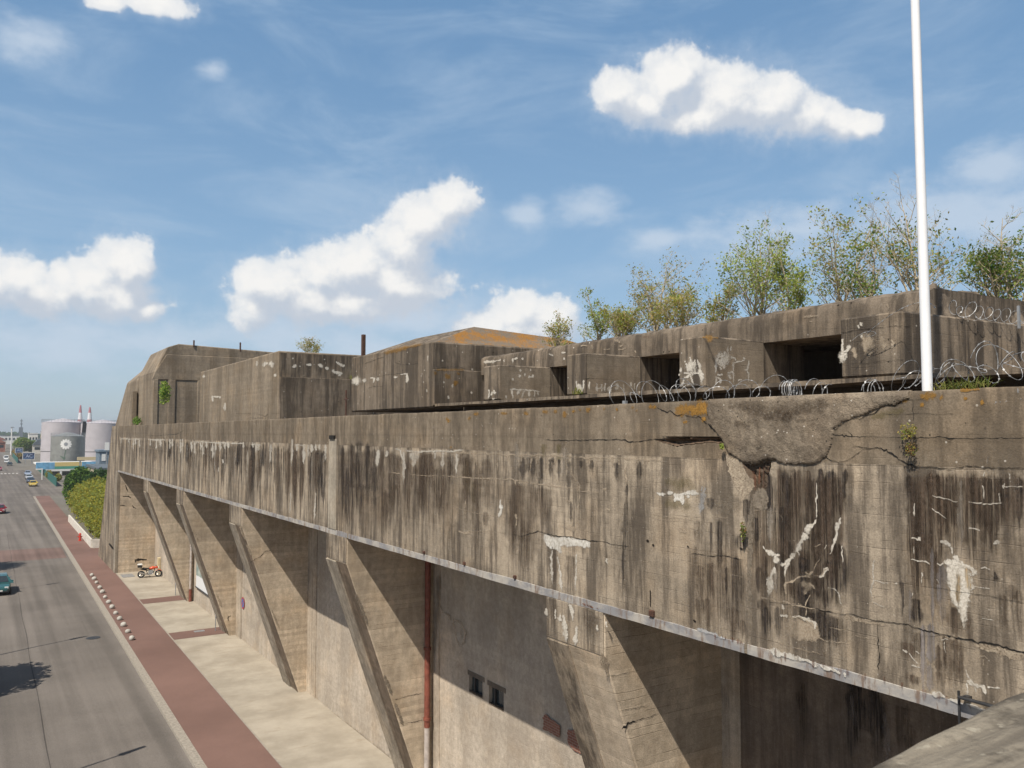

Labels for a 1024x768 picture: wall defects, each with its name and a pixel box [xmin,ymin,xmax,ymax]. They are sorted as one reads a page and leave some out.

crack [657,407,772,462]
crack [826,399,1024,469]
leakage [119,438,327,518]
leakage [341,443,664,589]
crack [513,531,628,547]
leakage [657,490,713,508]
spalling [726,454,771,613]
leakage [687,469,876,653]
leakage [870,457,1023,694]
efflorescence [544,604,578,645]